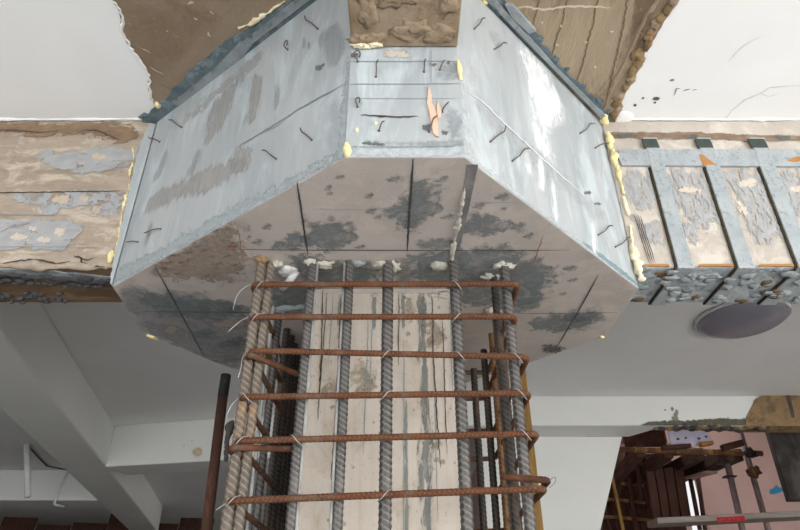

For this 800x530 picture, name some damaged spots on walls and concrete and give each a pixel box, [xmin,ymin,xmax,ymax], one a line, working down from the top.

peeling [0,121,139,176]
flaking render [112,0,290,104]
damp [188,53,262,142]
damp [519,47,563,221]
flaking render [500,0,679,122]
peeling [0,186,124,262]
damp [270,216,364,307]
damp [367,177,452,229]
damp [397,203,604,333]
damp [122,287,249,366]
damp [542,344,566,354]
damp [401,293,445,530]